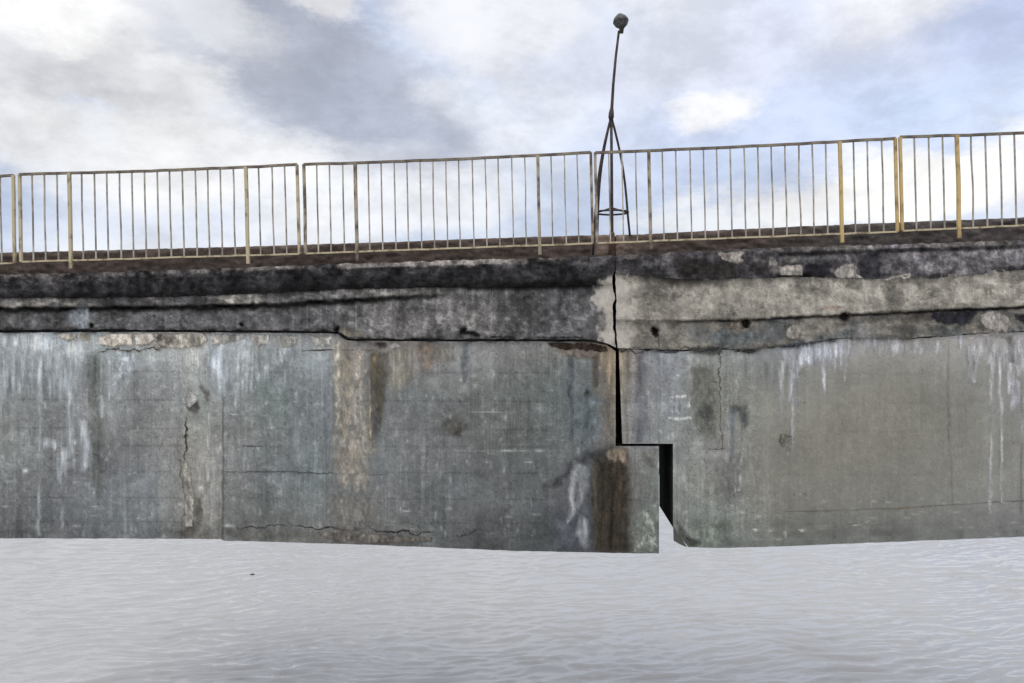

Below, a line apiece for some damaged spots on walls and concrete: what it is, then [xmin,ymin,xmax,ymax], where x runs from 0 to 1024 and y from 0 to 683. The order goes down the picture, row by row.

water stain [679,258,767,278]
water stain [805,264,831,275]
water stain [859,254,881,278]
spalling [59,333,298,353]
peeling [311,336,332,347]
water stain [780,310,1024,422]
rust [369,342,386,439]
water stain [0,336,99,483]
rust [593,449,629,551]